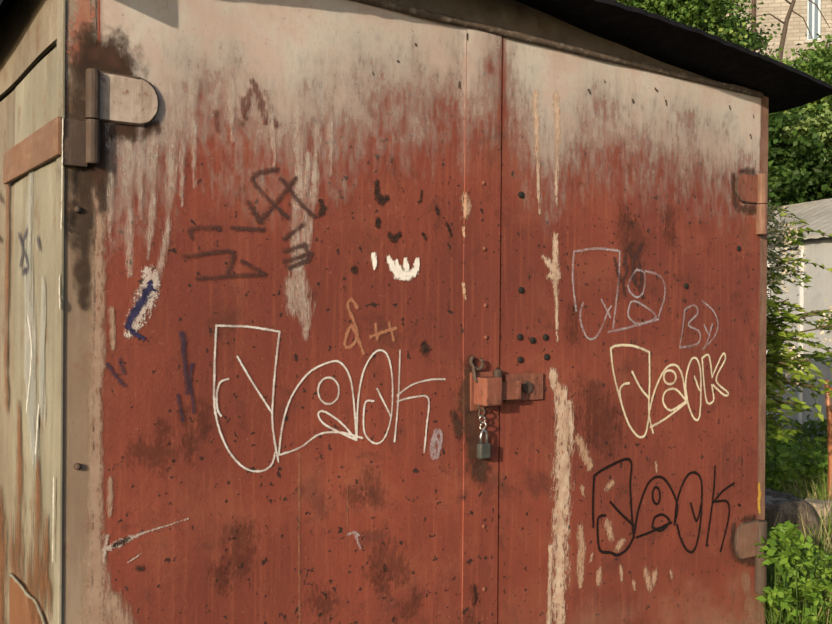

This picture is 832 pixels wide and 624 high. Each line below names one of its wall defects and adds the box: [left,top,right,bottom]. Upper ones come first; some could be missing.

rust [80,40,131,75]
rust [91,121,161,186]
peeling [543,232,561,342]
peeling [546,368,593,624]
peeling [604,518,625,552]
peeling [619,564,657,592]